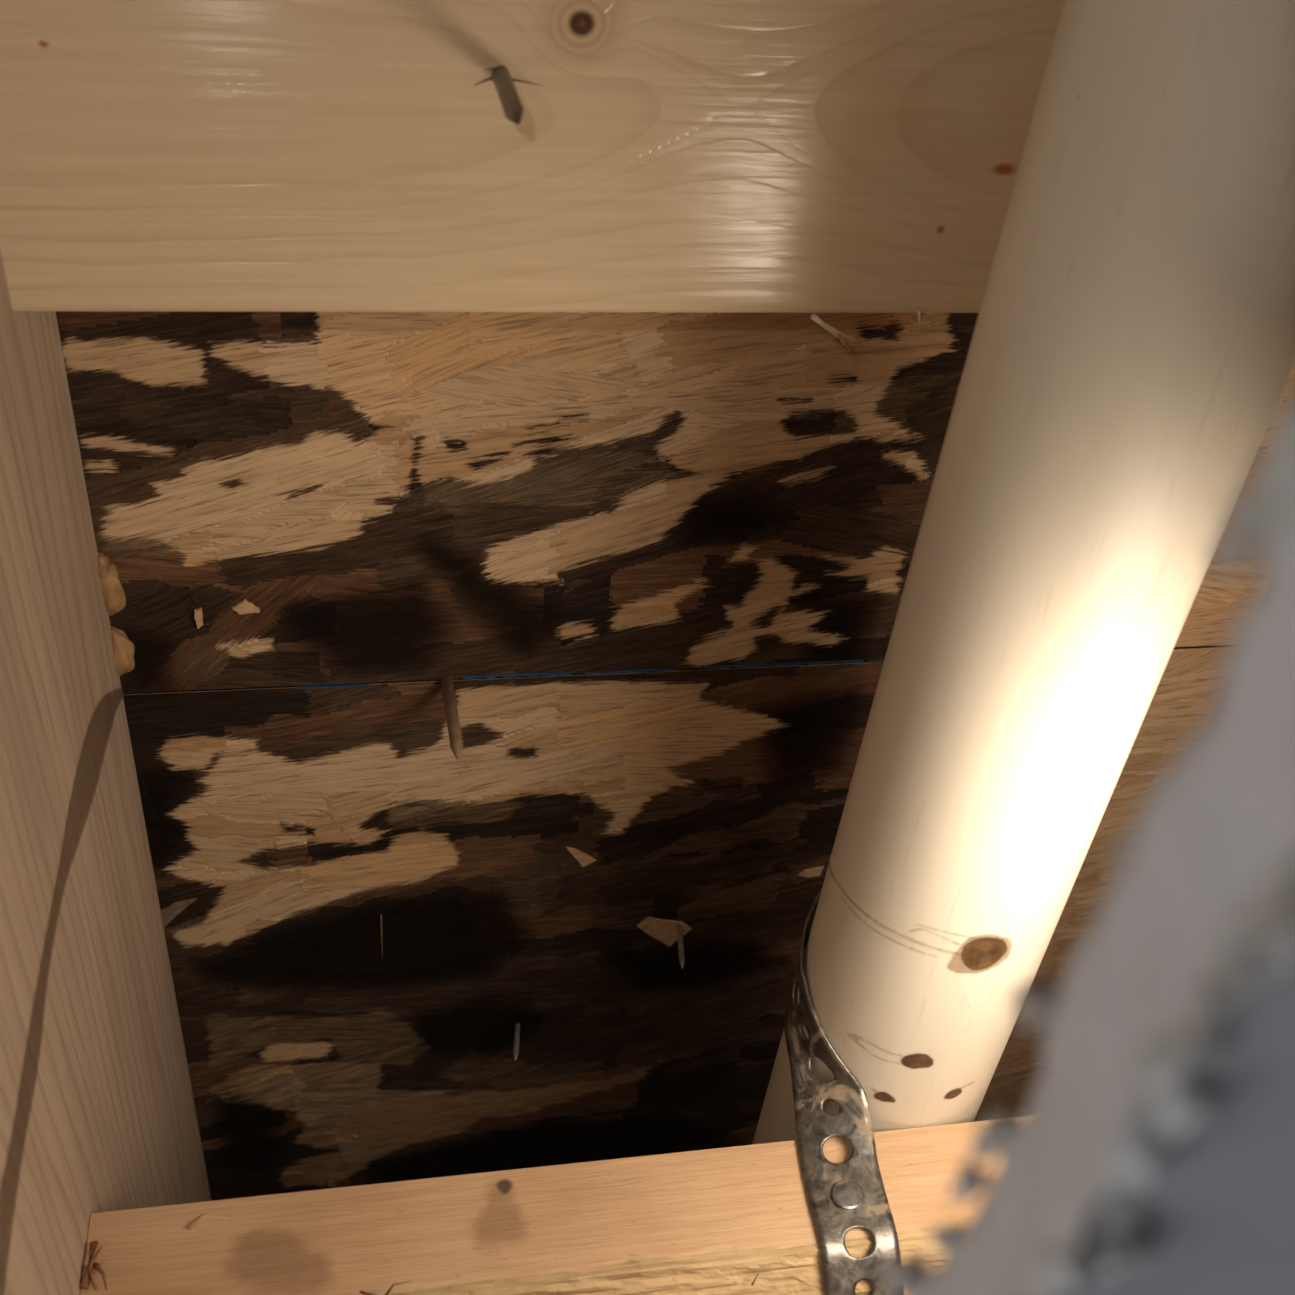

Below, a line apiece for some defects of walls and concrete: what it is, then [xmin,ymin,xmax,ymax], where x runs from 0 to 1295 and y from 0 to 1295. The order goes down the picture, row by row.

damp [0,311,979,1295]
damp [875,921,1010,973]
crack [359,1281,411,1295]